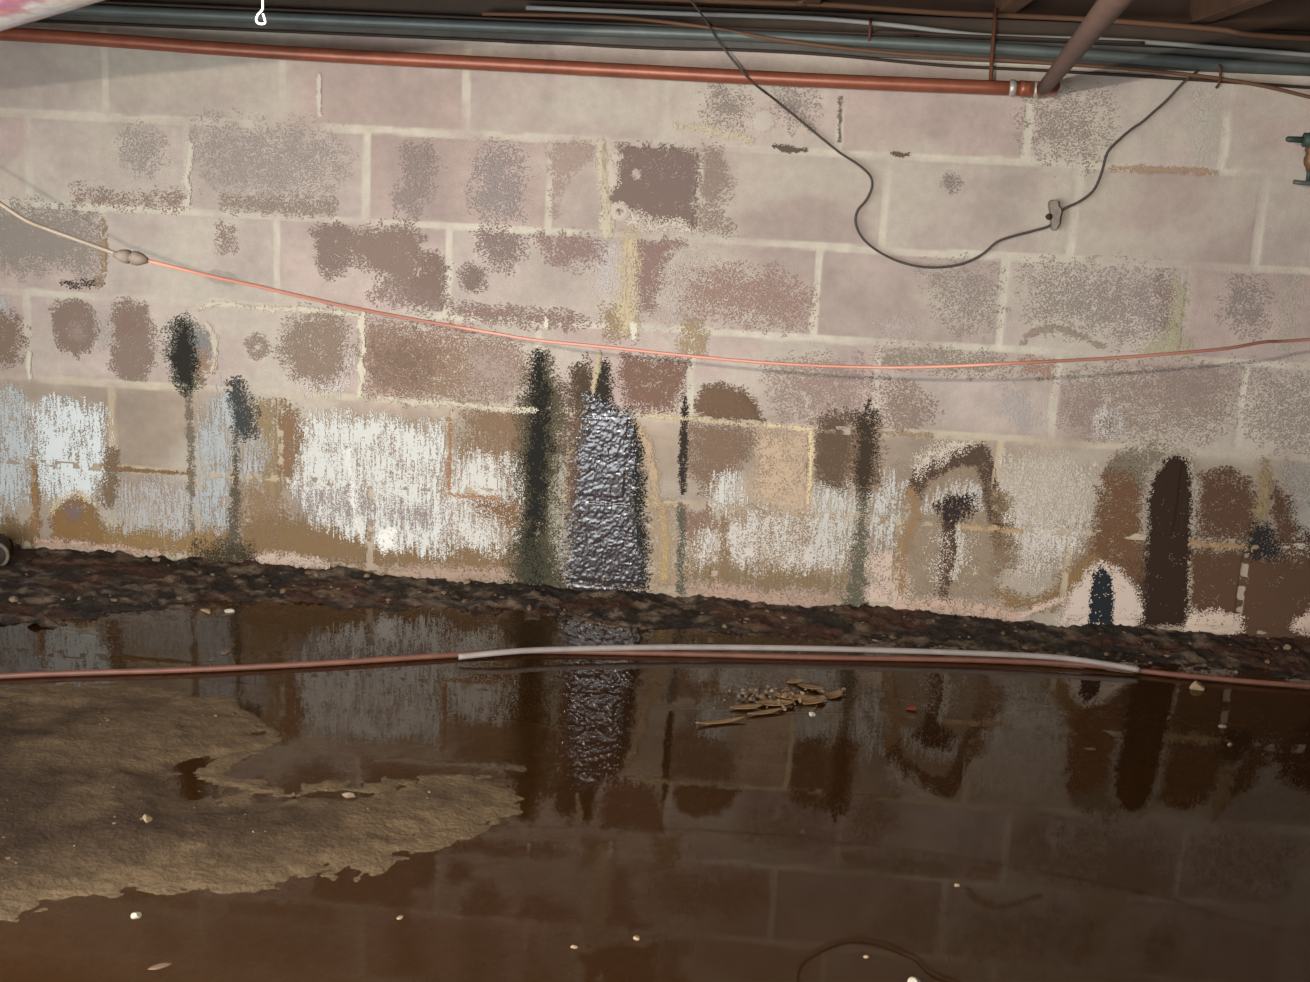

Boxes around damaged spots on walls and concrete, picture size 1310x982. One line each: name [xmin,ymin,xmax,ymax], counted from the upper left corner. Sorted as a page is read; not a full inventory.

damp [0,81,1310,629]